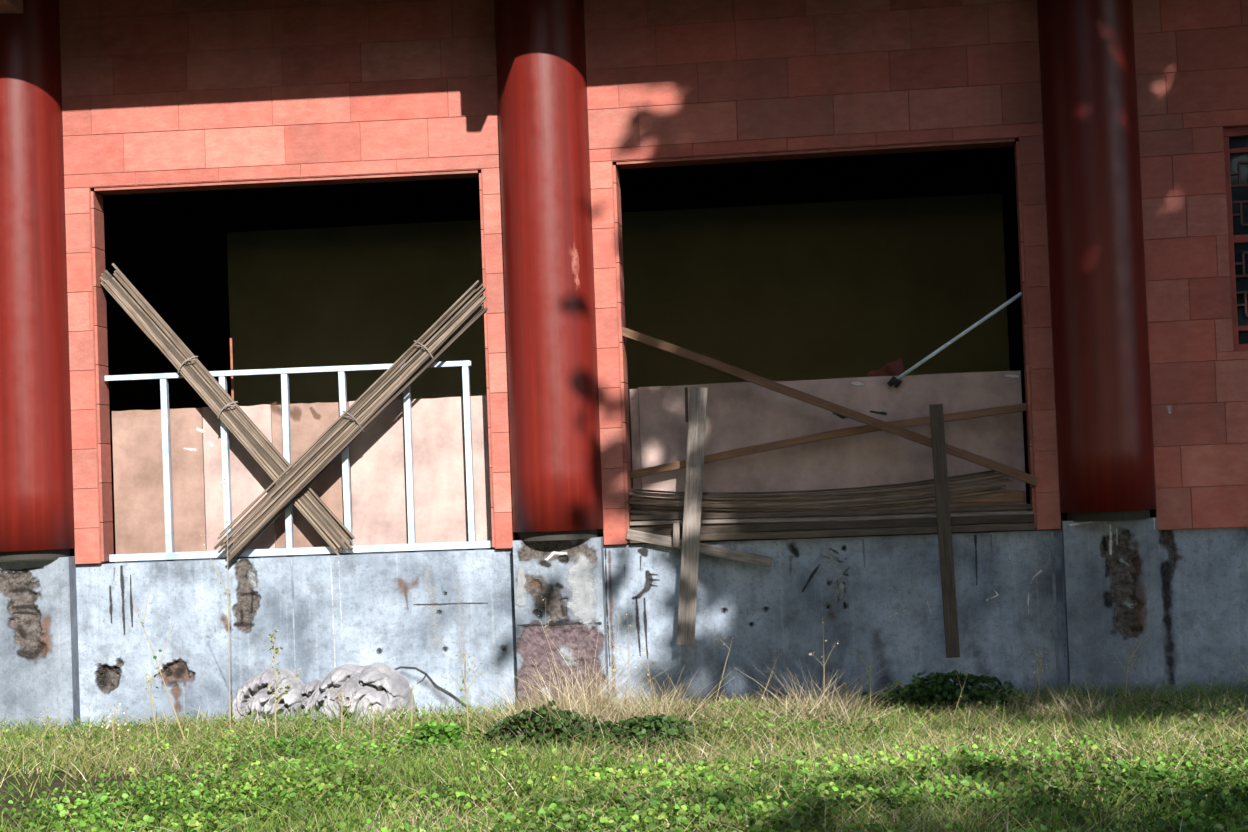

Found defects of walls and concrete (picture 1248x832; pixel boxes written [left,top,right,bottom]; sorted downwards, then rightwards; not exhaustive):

spalling [0,558,55,658]
spalling [96,659,124,693]
spalling [222,559,261,633]
peeling [502,539,606,709]
spalling [1069,521,1145,640]
spalling [1153,518,1177,685]